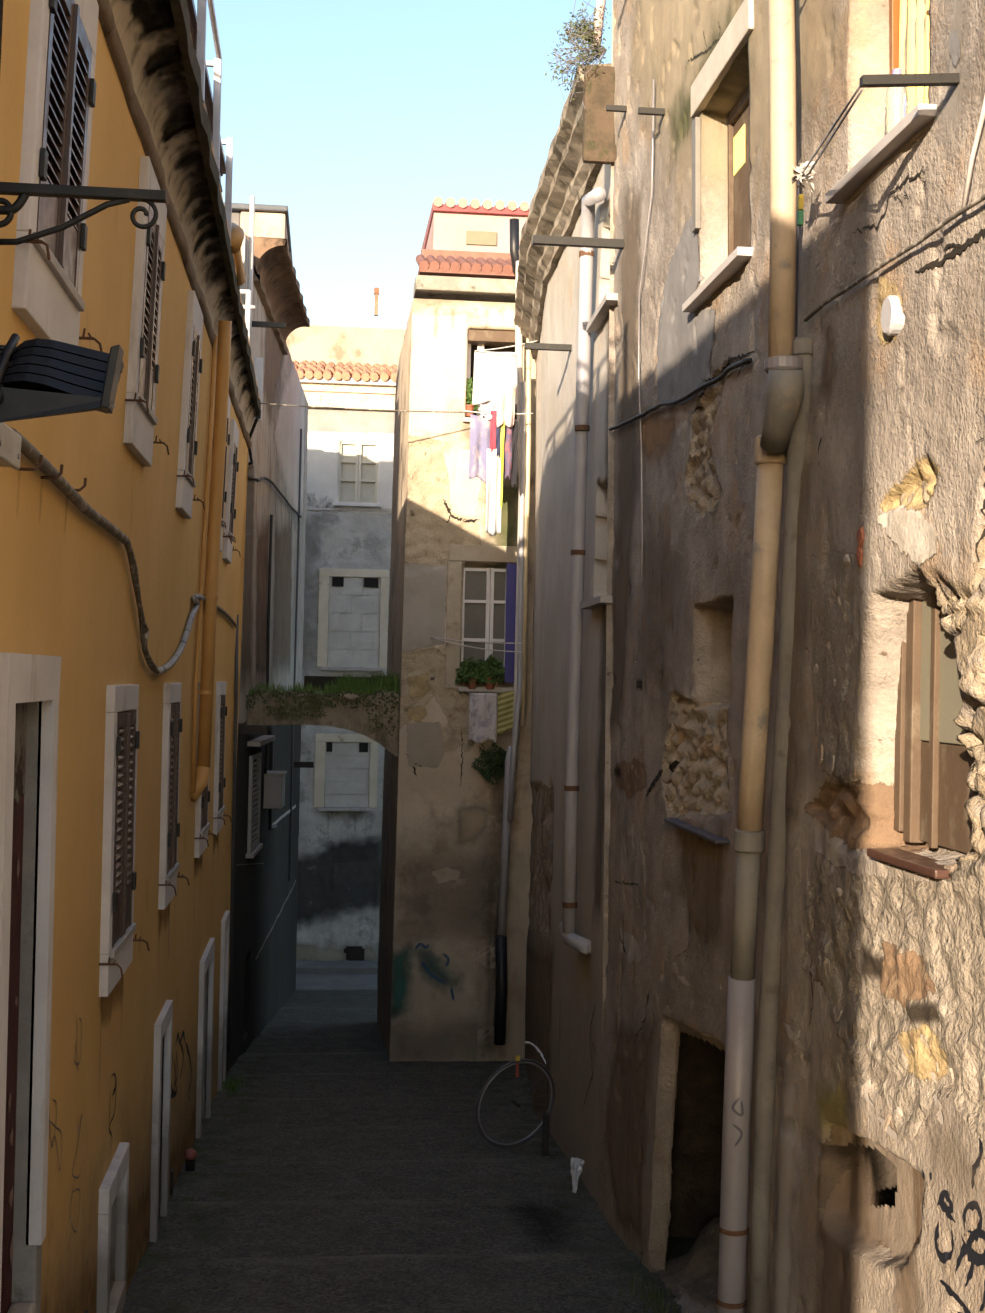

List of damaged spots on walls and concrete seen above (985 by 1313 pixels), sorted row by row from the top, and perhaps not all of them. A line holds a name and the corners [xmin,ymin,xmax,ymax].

spalling [874,275,903,345]
crack [853,167,927,234]
crack [914,229,985,272]
spalling [684,359,738,518]
crack [973,438,985,567]
spalling [614,692,730,819]
spalling [802,457,985,1269]
hole [668,1031,725,1237]